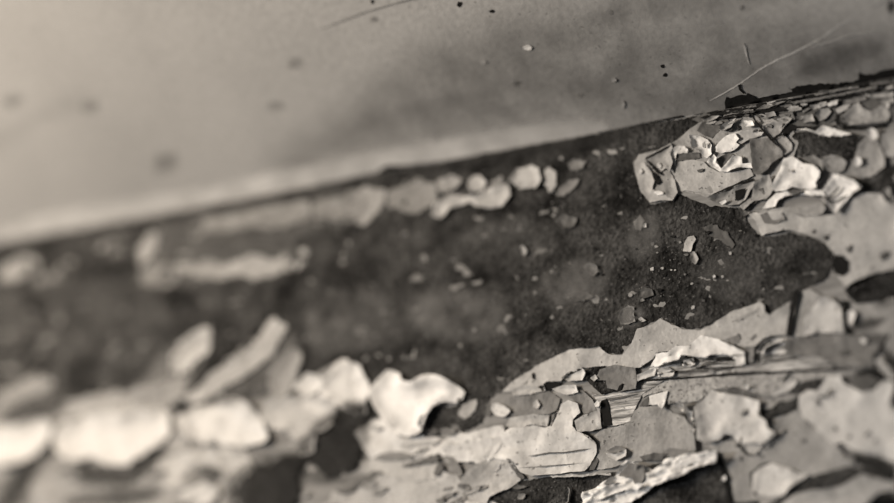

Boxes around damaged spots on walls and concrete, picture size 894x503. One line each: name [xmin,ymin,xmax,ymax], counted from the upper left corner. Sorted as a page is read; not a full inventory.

peeling [191,159,587,240]
peeling [634,97,894,288]
peeling [0,256,39,282]
peeling [138,232,309,288]
peeling [583,263,604,276]
peeling [0,284,894,503]